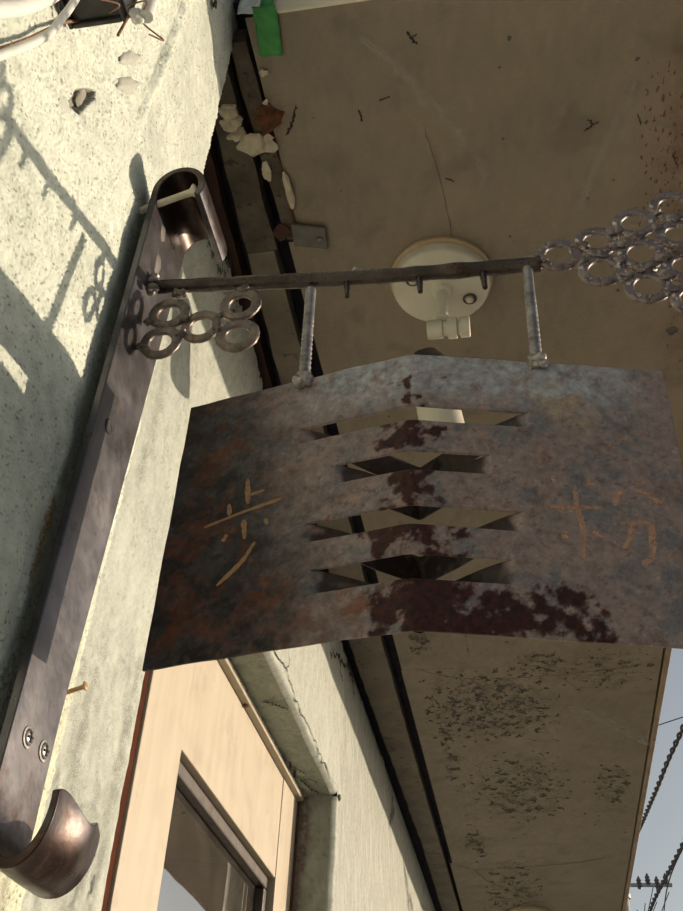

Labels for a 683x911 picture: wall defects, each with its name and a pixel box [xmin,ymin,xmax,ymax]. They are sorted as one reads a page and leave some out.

spalling [59,88,95,114]
crack [262,649,335,793]